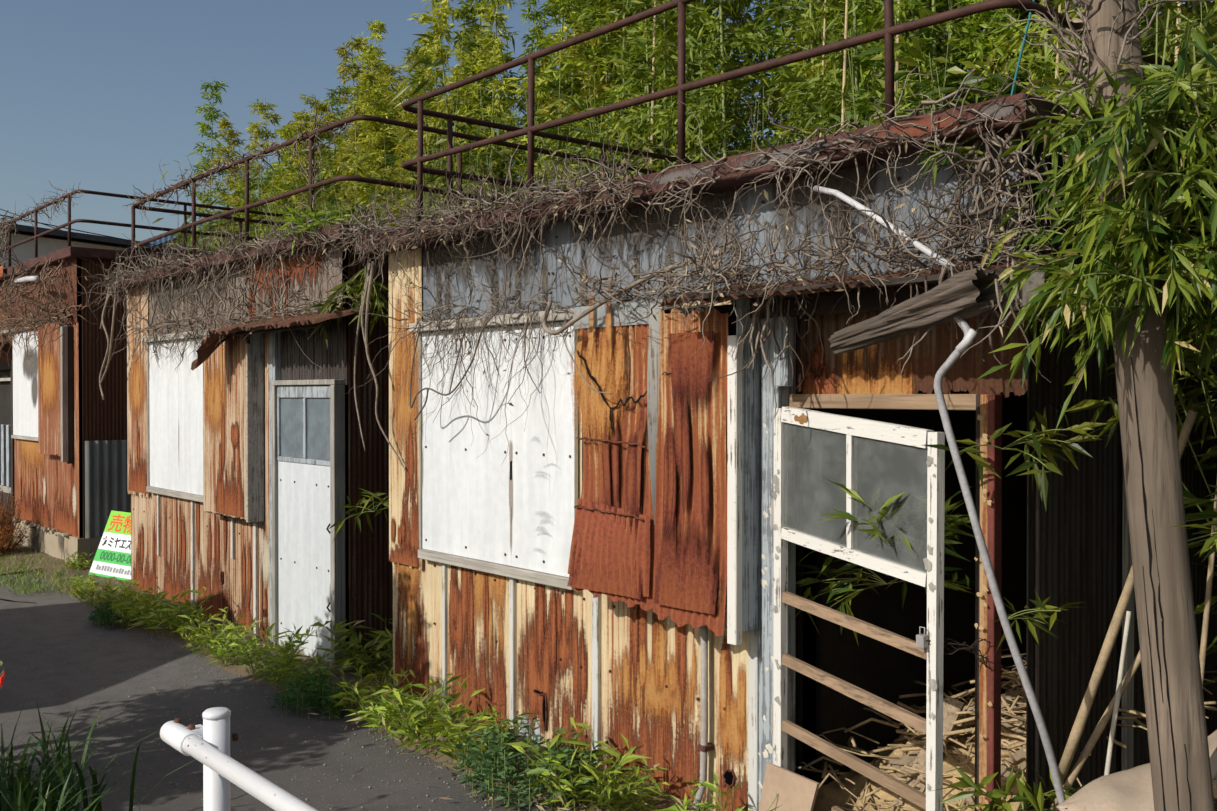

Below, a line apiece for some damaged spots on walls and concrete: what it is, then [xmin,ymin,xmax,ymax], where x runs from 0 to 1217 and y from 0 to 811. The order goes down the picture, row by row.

rust [39,340,59,414]
rust [128,328,147,494]
rust [571,286,645,542]
rust [802,336,913,394]
rust [16,441,78,536]
rust [133,341,270,640]
rust [388,286,429,700]
peeling [763,469,780,530]
rust [448,331,748,811]
peeling [761,546,780,589]
peeling [758,735,775,758]